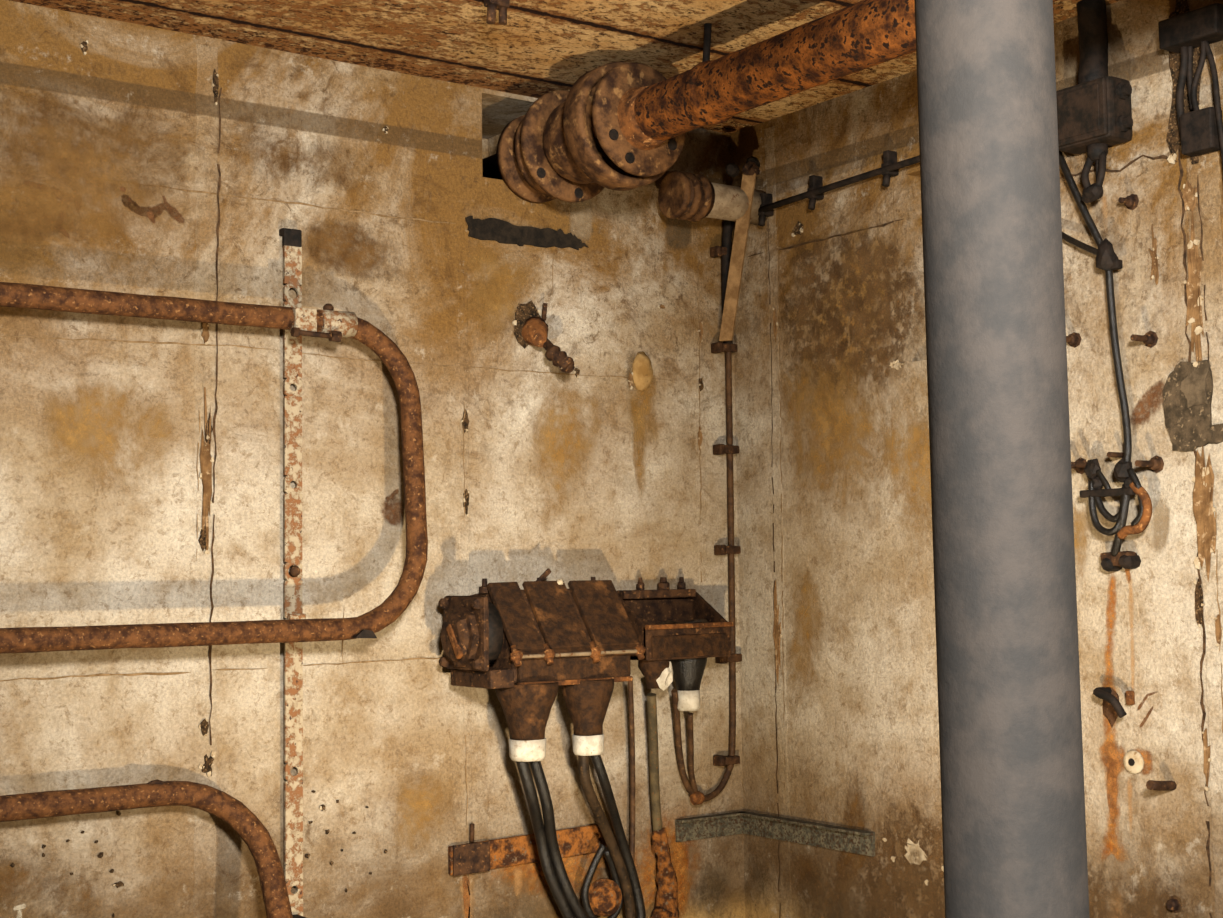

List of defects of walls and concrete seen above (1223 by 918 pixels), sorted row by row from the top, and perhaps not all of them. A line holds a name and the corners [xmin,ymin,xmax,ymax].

spalling [198,387,214,554]
rust [1104,569,1132,691]
rust [1100,718,1153,858]
damp [796,803,945,918]
damp [1088,877,1192,918]